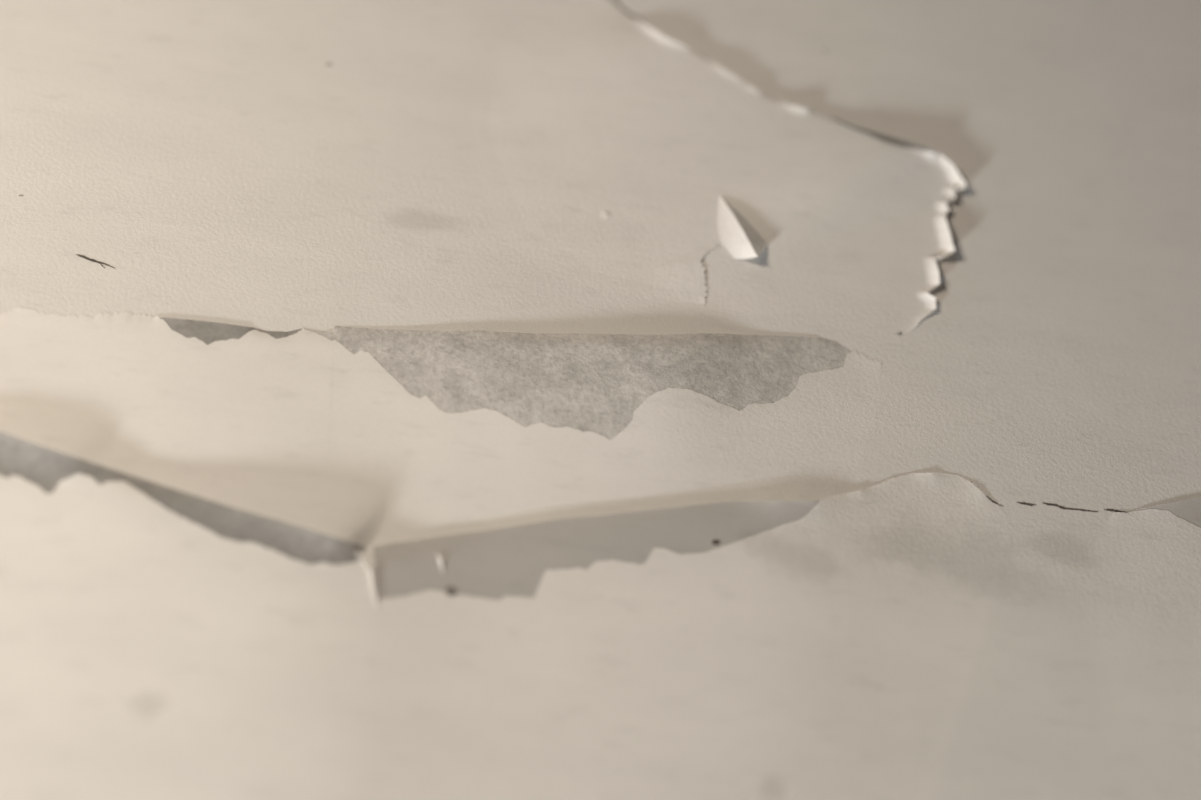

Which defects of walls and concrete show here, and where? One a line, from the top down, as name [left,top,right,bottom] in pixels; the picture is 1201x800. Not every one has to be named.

peeling [486,0,966,336]
peeling [0,307,1007,800]